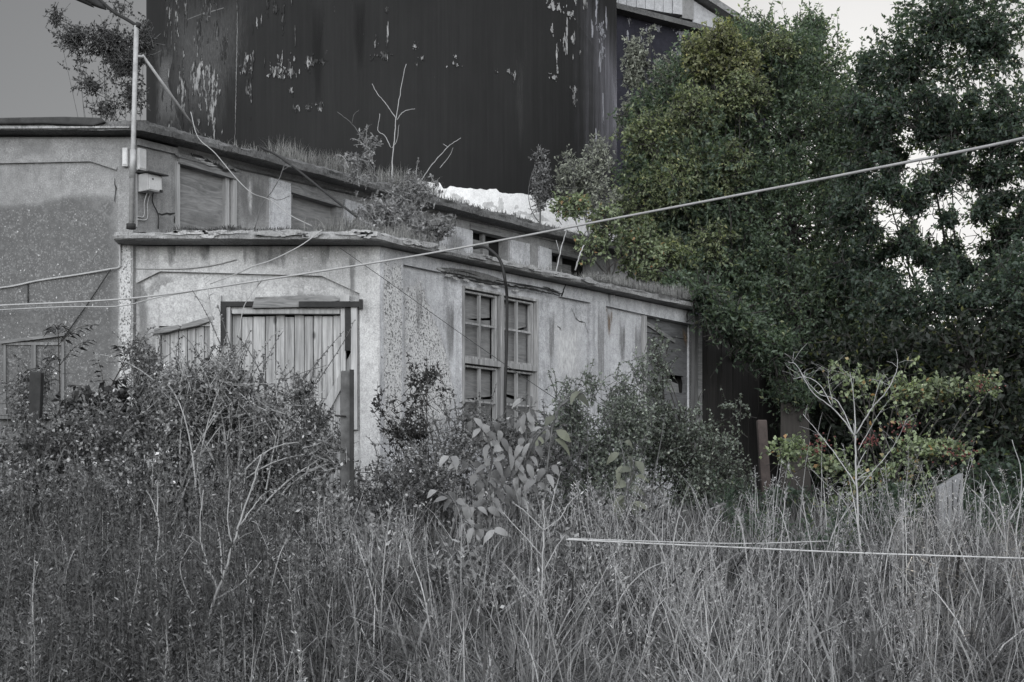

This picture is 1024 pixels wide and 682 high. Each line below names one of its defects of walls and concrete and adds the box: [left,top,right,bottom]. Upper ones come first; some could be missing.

peeling [158,0,326,140]
peeling [546,0,607,82]